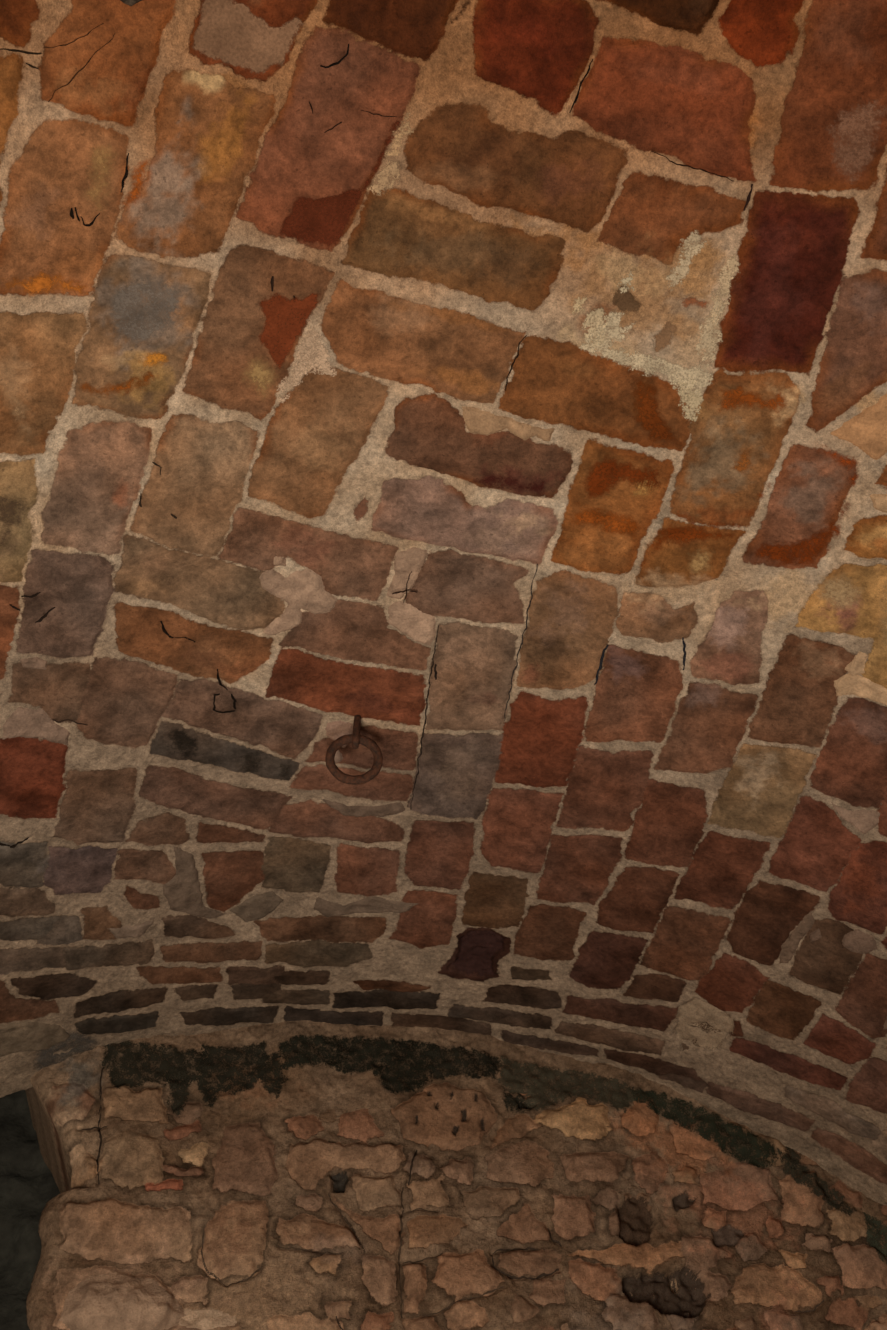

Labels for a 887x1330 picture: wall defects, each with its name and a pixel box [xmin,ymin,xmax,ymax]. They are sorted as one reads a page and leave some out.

crack [26,23,115,102]
crack [160,621,195,642]
crack [213,669,236,713]
crack [0,837,29,848]